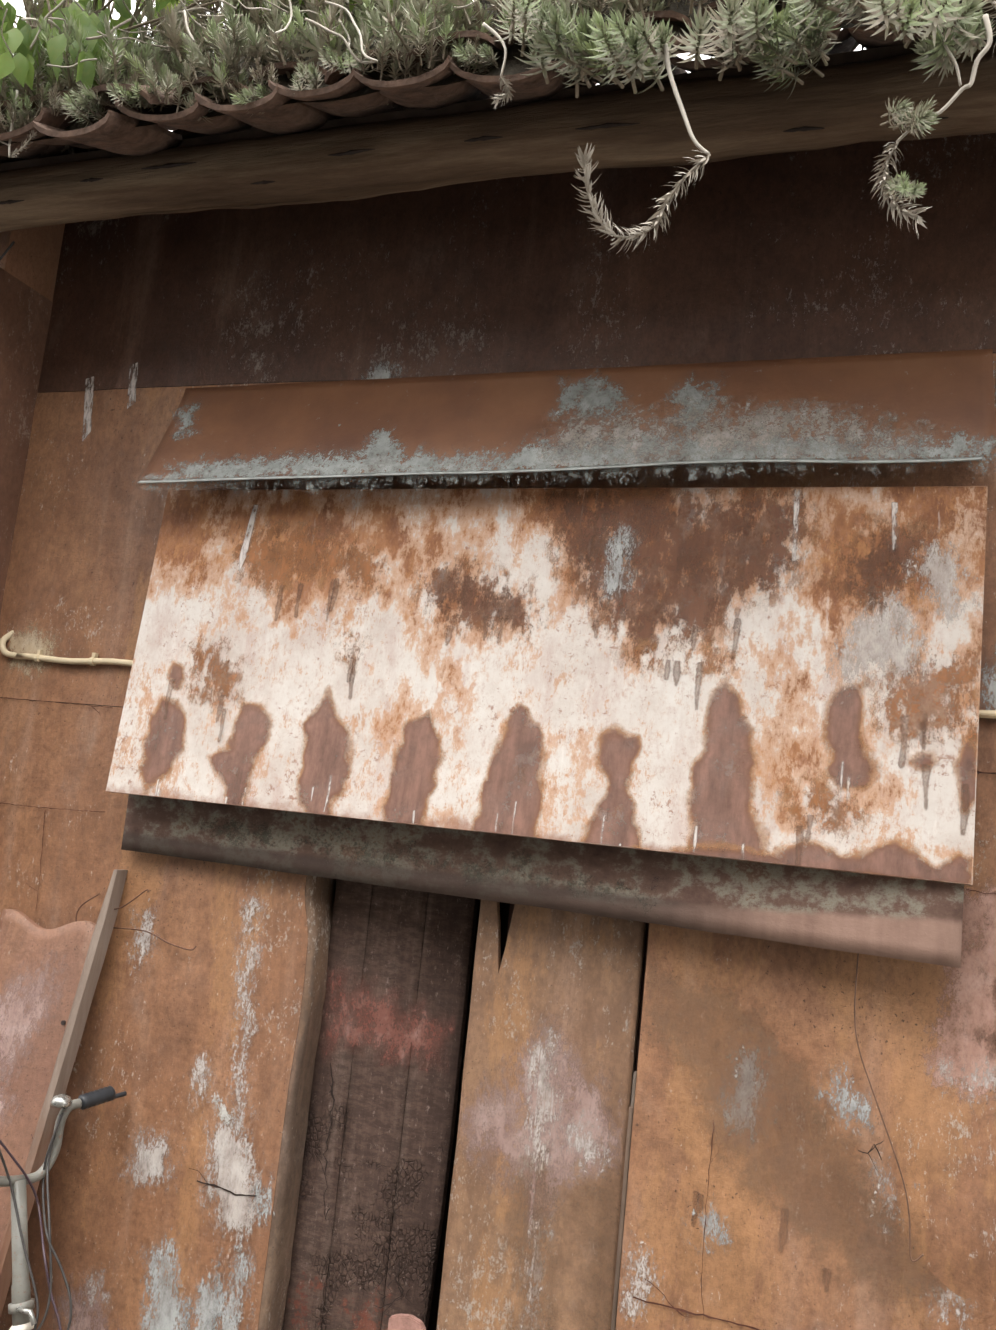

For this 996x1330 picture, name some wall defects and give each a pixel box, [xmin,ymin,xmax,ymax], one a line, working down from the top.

peeling [361,359,402,380]
peeling [133,370,996,497]
corrosion [415,558,541,639]
corrosion [139,638,271,805]
corrosion [297,690,351,815]
corrosion [383,712,443,825]
corrosion [472,704,545,837]
corrosion [540,488,981,884]
peeling [980,653,996,719]
peeling [51,891,275,1330]
crack [633,1121,760,1330]
peeling [920,1285,977,1330]